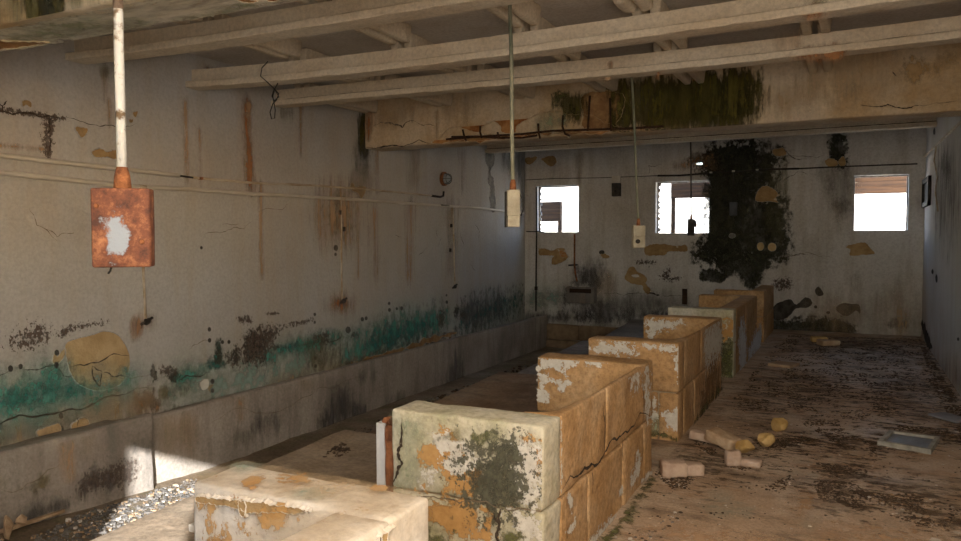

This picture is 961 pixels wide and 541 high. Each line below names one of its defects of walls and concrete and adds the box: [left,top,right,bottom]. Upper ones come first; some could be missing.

damp [27,0,64,18]
peeling [0,0,298,52]
crack [0,101,127,152]
damp [615,67,762,126]
damp [684,138,794,291]
damp [0,271,668,432]
peeling [536,317,686,404]
peeling [628,366,678,432]
crack [392,422,403,486]
peeling [194,471,314,541]
crack [423,496,537,541]